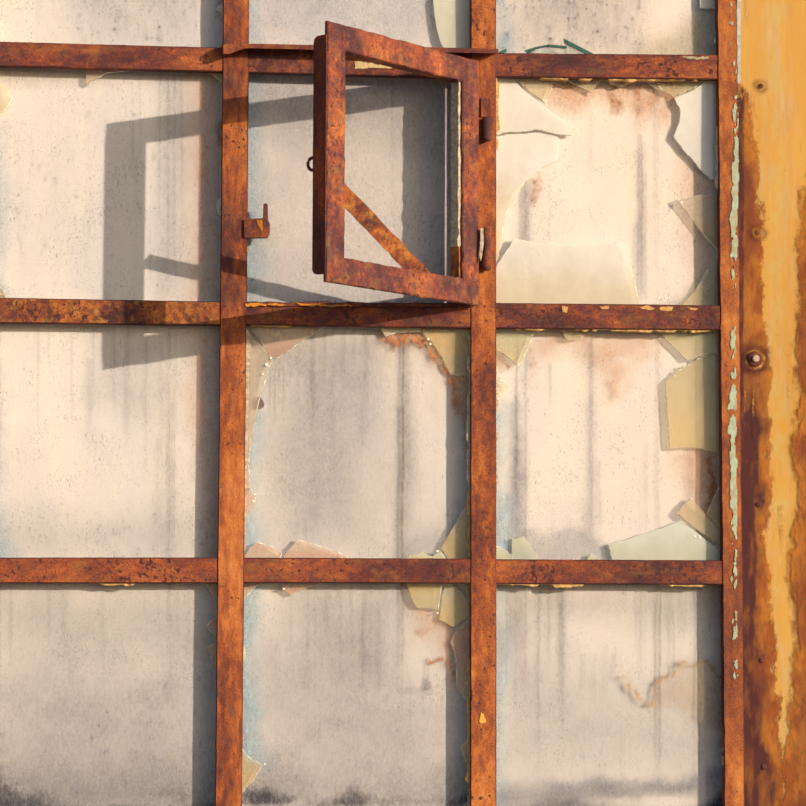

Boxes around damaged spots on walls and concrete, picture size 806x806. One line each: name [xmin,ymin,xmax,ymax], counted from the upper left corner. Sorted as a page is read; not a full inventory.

peeling [730,0,747,83]
peeling [729,96,739,288]
rust [451,246,461,278]
rust [386,333,467,416]
peeling [727,326,738,589]
rust [737,84,806,806]
leakage [0,780,65,806]